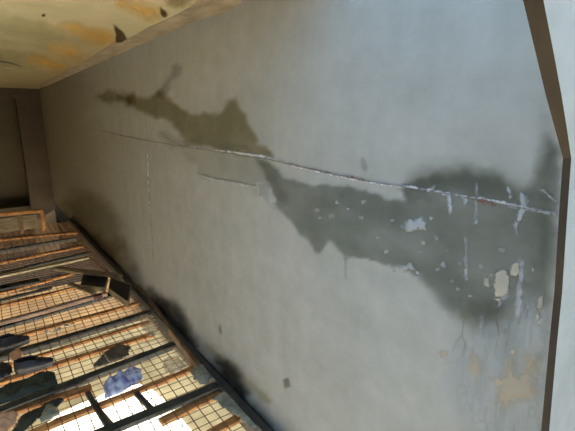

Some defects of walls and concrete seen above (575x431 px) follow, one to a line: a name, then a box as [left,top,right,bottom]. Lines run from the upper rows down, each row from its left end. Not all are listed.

spalling [114,26,126,43]
crack [54,122,557,254]
peeling [401,217,432,231]
peeling [484,262,520,301]
damp [516,262,524,318]